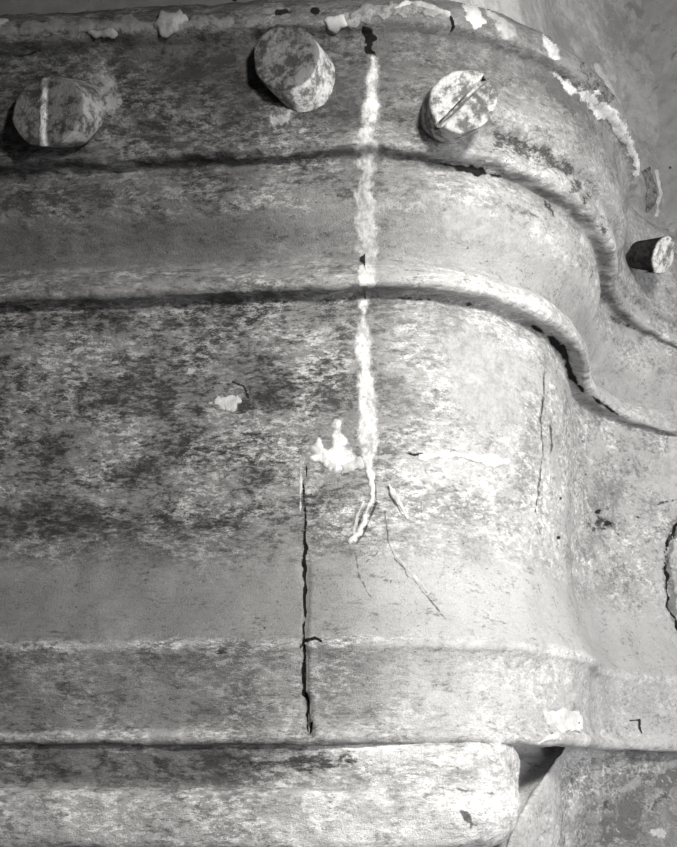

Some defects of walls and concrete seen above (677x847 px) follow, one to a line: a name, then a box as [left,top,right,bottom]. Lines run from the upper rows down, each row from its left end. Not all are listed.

crack [299,464,322,733]
crack [662,523,677,630]
peeling [650,828,667,839]